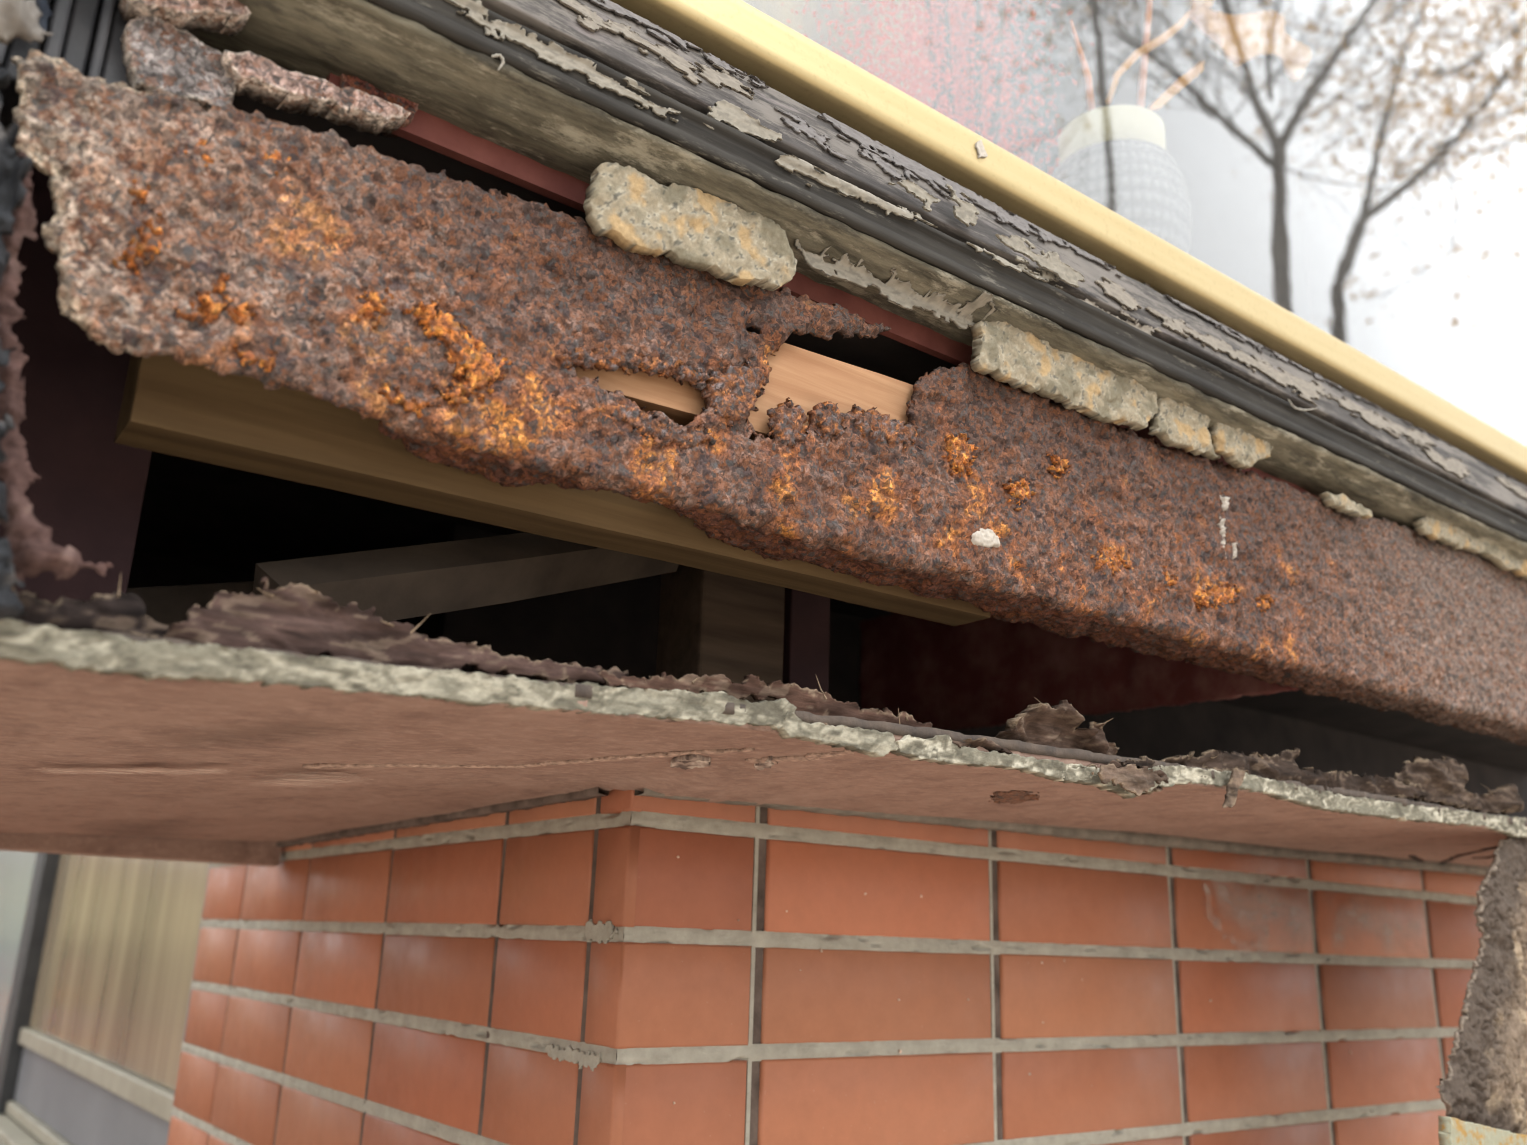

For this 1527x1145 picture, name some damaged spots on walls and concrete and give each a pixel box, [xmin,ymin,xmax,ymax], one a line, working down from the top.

peeling [220,50,411,136]
peeling [445,0,681,123]
rust [112,174,171,275]
peeling [557,0,1527,500]
rust [174,272,259,331]
rust [355,288,513,419]
rust [554,346,919,450]
rust [941,433,979,478]
rust [1002,478,1037,511]
spalling [1319,492,1373,519]
spalling [127,553,254,588]
spalling [0,574,1527,838]